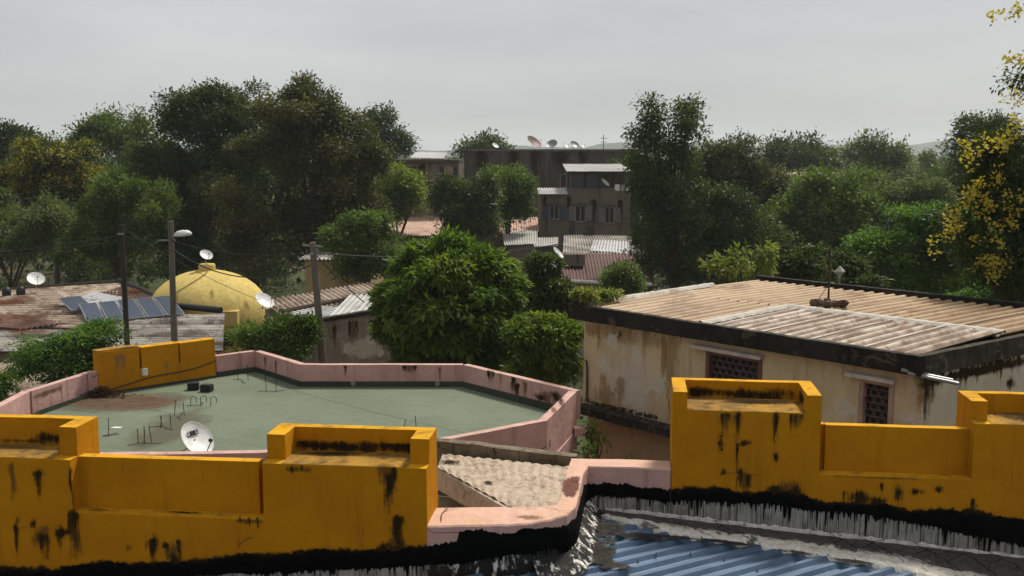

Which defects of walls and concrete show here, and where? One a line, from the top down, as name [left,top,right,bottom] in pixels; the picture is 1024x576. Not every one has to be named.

corrosion [0,298,51,335]
damp [511,377,564,412]
damp [689,386,804,493]
damp [296,440,410,501]
damp [842,477,943,504]
damp [13,468,81,557]
damp [146,536,181,561]